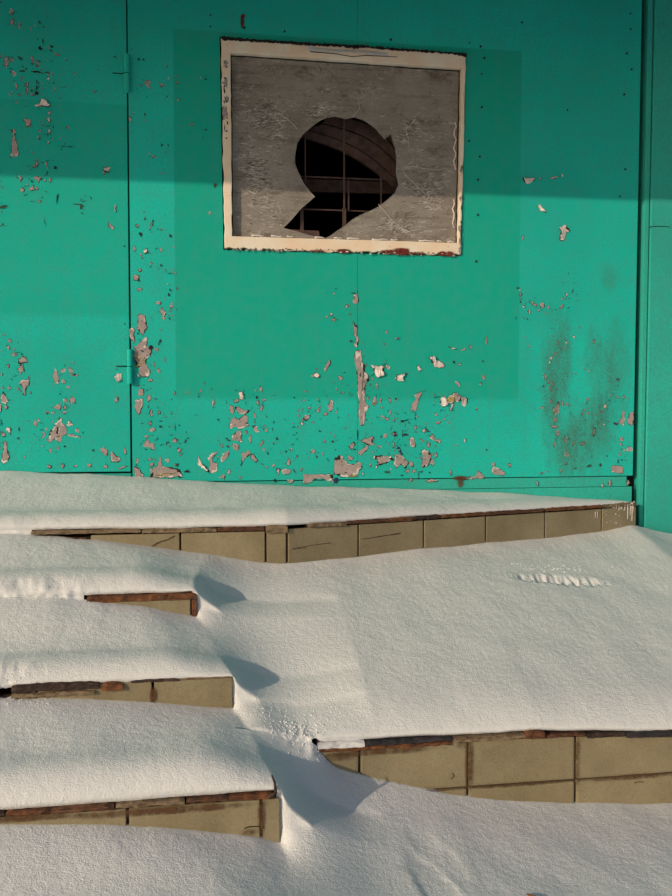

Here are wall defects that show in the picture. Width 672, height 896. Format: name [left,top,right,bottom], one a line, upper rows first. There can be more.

peeling [0,2,72,150]
peeling [8,129,19,158]
peeling [16,151,57,203]
peeling [559,224,570,241]
peeling [0,333,84,464]
peeling [92,211,189,478]
peeling [197,285,478,484]
peeling [533,326,634,487]
peeling [450,462,512,487]